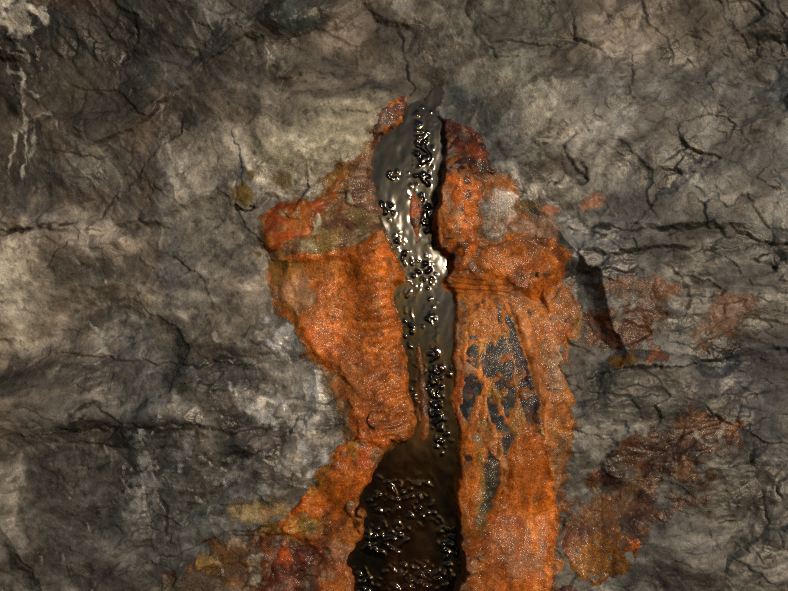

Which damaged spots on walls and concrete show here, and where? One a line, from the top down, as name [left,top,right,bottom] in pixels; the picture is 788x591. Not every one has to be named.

water stain [0,0,48,39]
corrosion [162,96,417,591]
corrosion [432,119,746,591]